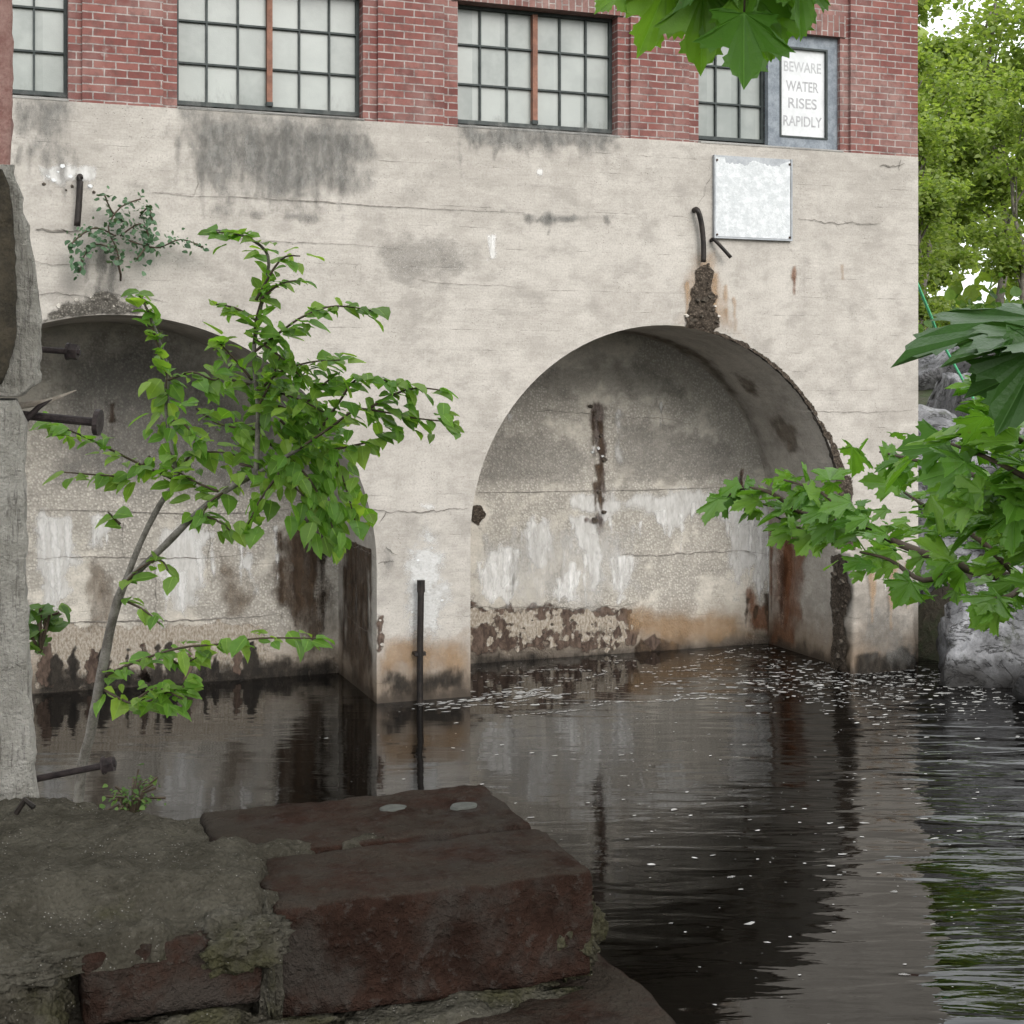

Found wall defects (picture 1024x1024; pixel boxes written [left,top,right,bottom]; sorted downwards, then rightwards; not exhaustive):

water stain [198,116,367,196]
water stain [40,541,373,693]
water stain [274,518,330,650]
spalling [471,505,486,525]
efflorescence [478,518,552,603]
peeling [470,601,679,656]
corrosion [588,403,607,534]
efflorescence [554,489,710,603]
corrosion [746,531,805,643]